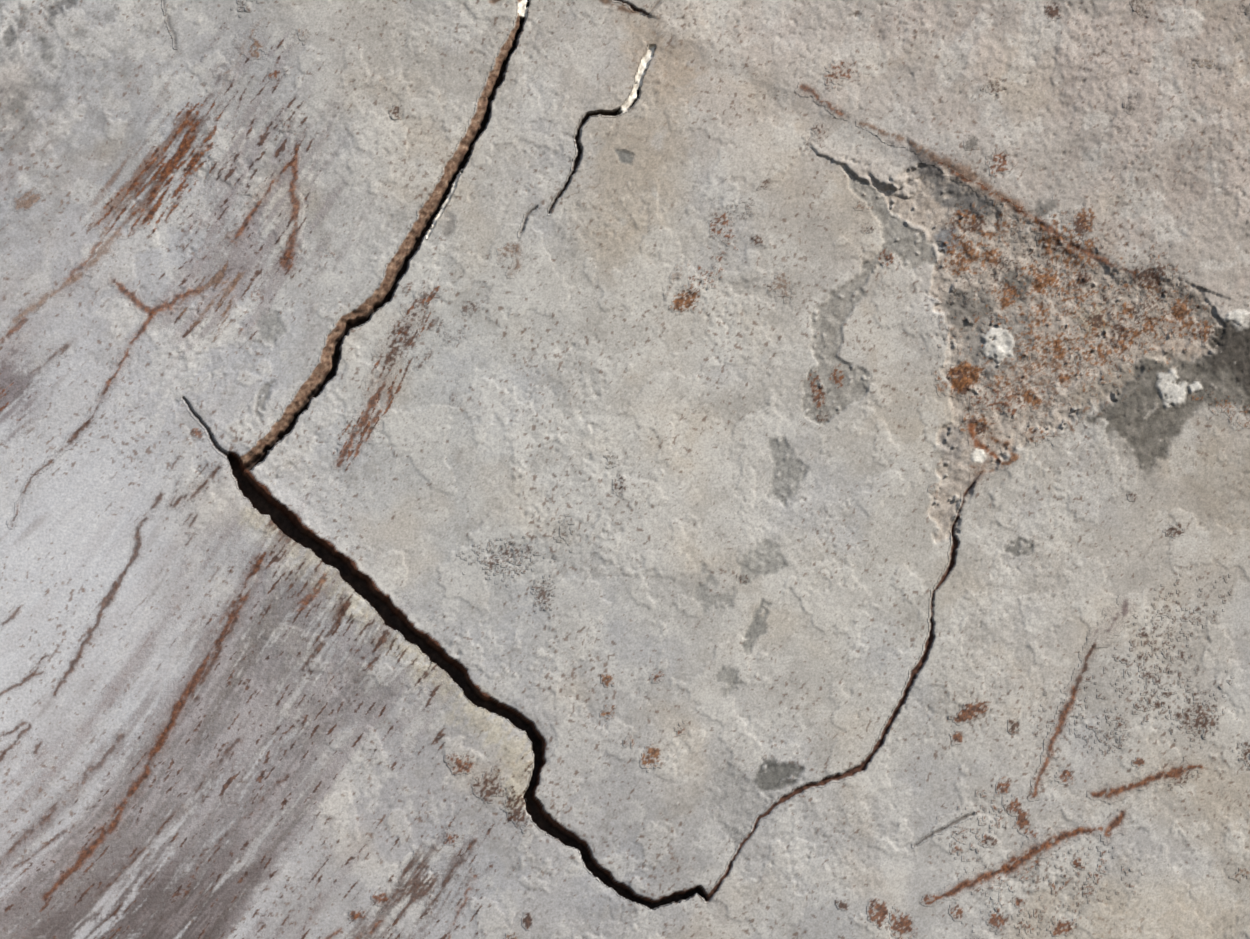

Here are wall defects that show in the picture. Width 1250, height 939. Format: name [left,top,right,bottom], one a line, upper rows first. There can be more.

rust [0,0,347,529]
rust [0,427,534,939]
rust [289,281,481,520]
rust [388,104,401,120]
crack [180,0,983,909]
rust [835,899,850,911]
peeling [799,150,1250,544]
rust [867,567,1234,939]
rust [1163,522,1187,538]
rust [1233,740,1250,769]